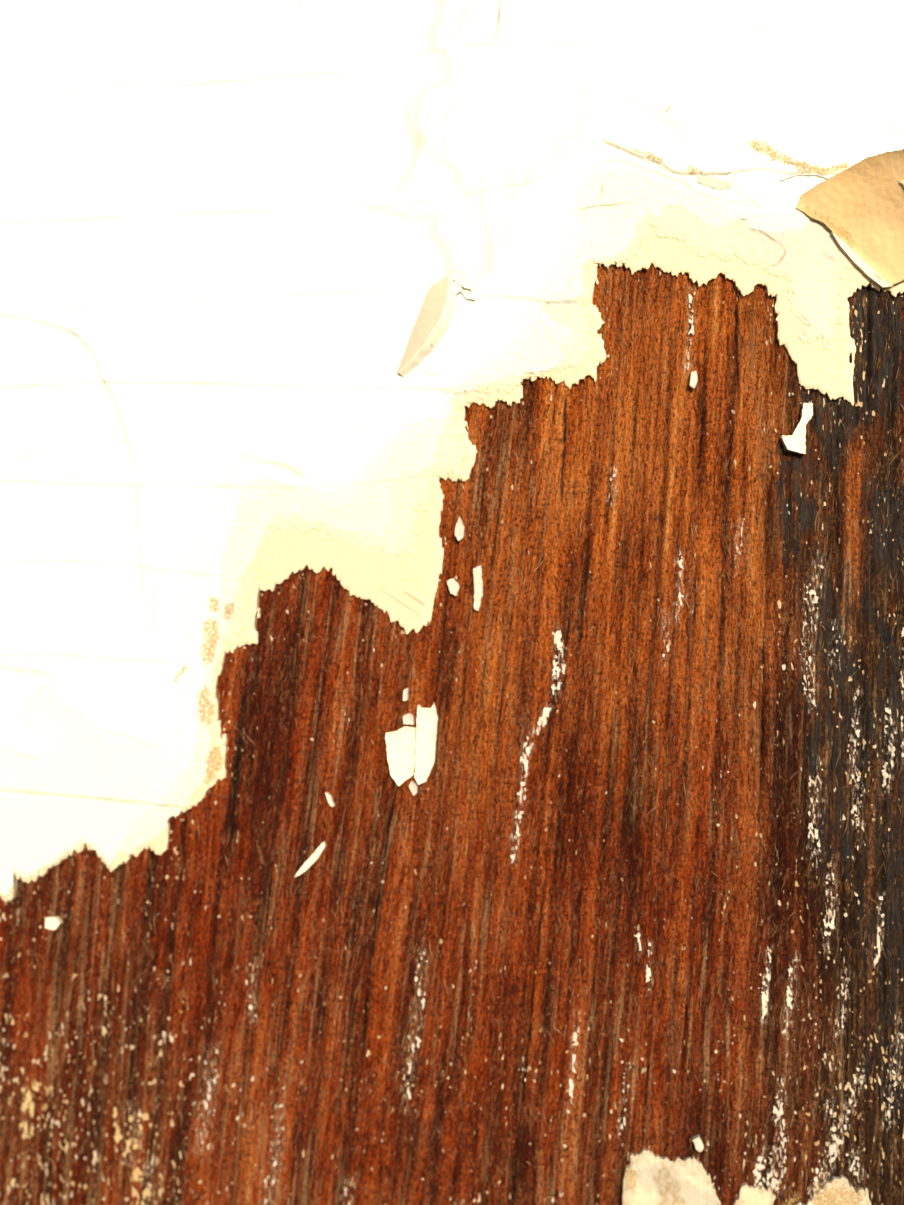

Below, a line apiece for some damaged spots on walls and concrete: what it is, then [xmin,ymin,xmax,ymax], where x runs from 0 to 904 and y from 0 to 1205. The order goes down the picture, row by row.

peeling [0,138,904,902]
peeling [45,916,63,930]
peeling [634,933,652,990]
peeling [760,948,772,1019]
peeling [781,958,797,1033]
peeling [823,862,835,938]
peeling [872,896,884,965]
peeling [567,1020,581,1113]
peeling [113,1107,169,1205]
peeling [692,1134,704,1152]
peeling [753,1077,787,1190]
peeling [808,1063,865,1195]